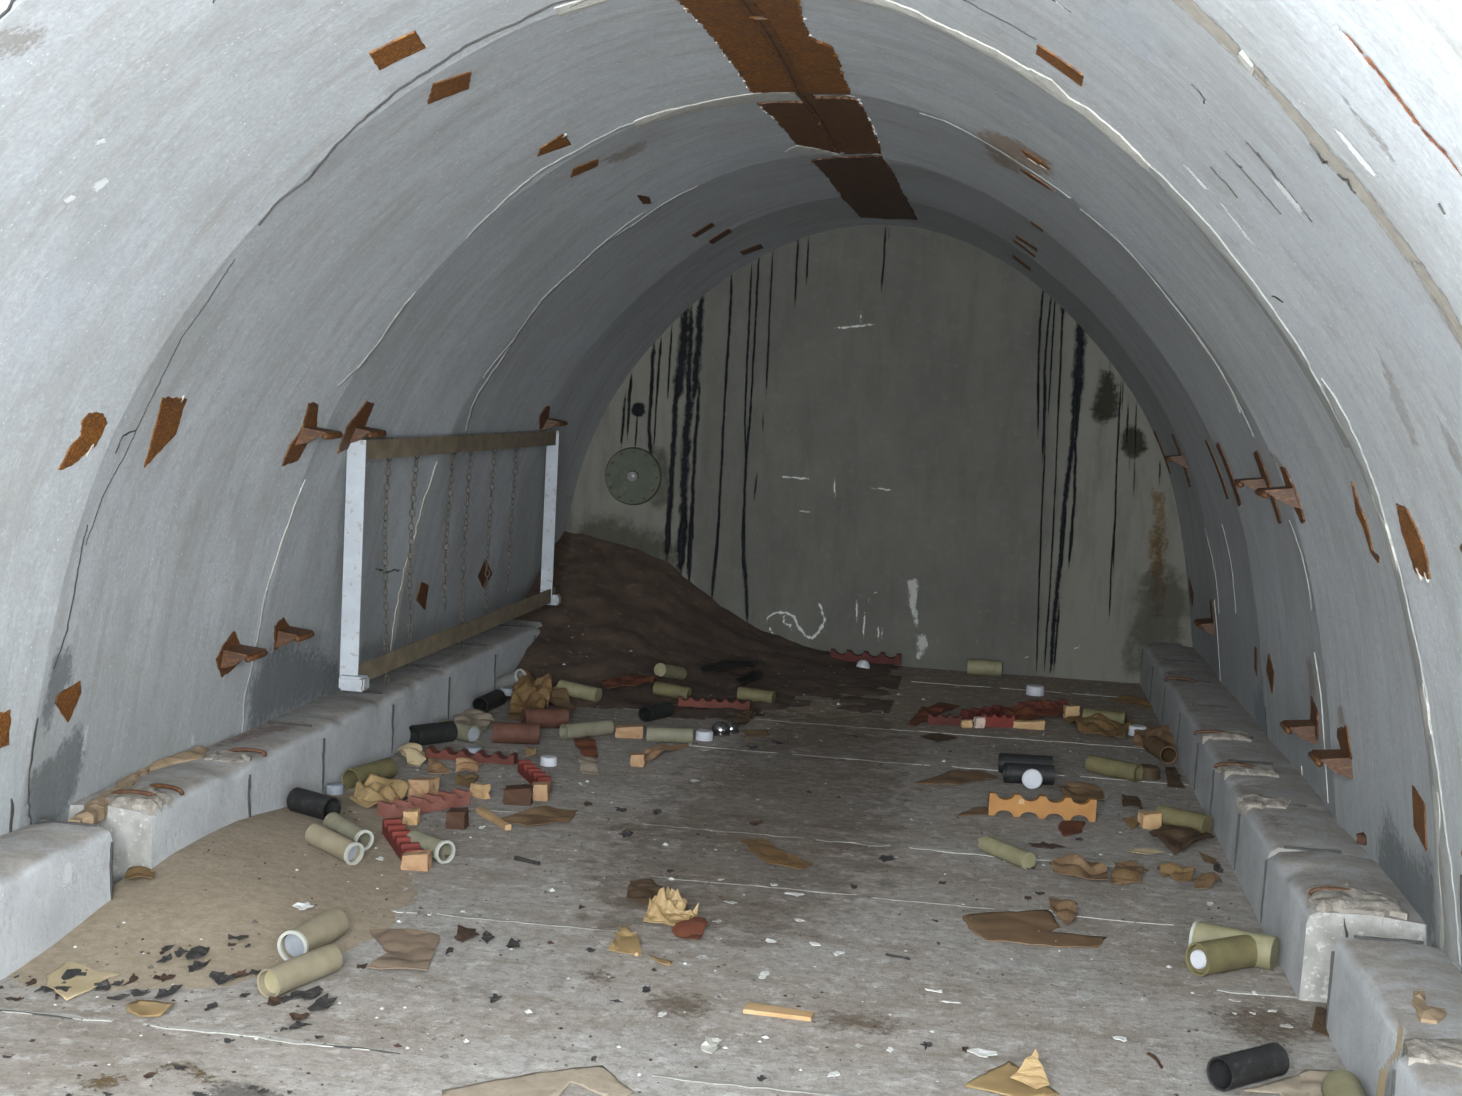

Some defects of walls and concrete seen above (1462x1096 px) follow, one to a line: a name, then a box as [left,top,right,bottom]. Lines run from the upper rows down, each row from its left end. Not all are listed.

corrosion [1339,29,1462,176]
leakage [794,240,809,300]
leakage [620,297,704,581]
leakage [711,253,773,623]
leakage [1036,290,1147,673]